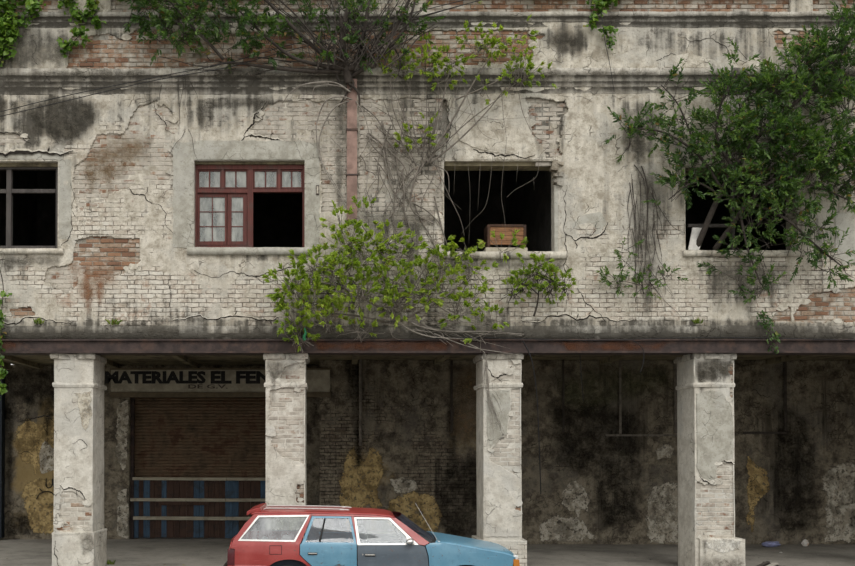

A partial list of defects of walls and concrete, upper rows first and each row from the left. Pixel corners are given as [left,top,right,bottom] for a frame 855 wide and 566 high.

damp [31,101,95,142]
spalling [43,237,141,293]
rust [83,272,102,306]
spalling [73,100,179,212]
crack [129,187,173,233]
flaking render [455,96,568,187]
crack [521,190,633,323]
damp [7,369,54,485]
spalling [265,363,305,507]
damp [553,401,641,526]
flaking render [696,363,734,539]
damp [699,360,732,390]